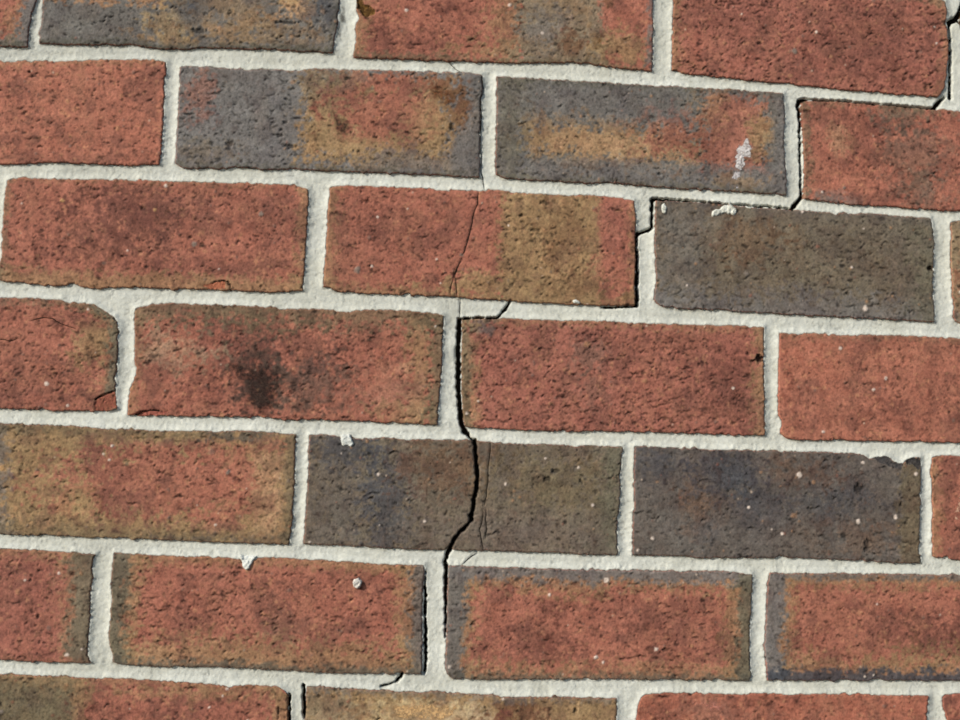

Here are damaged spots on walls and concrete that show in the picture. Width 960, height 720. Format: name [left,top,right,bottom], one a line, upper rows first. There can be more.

crack [718,6,960,211]
crack [602,198,690,309]
crack [381,61,510,686]
crack [289,684,307,720]